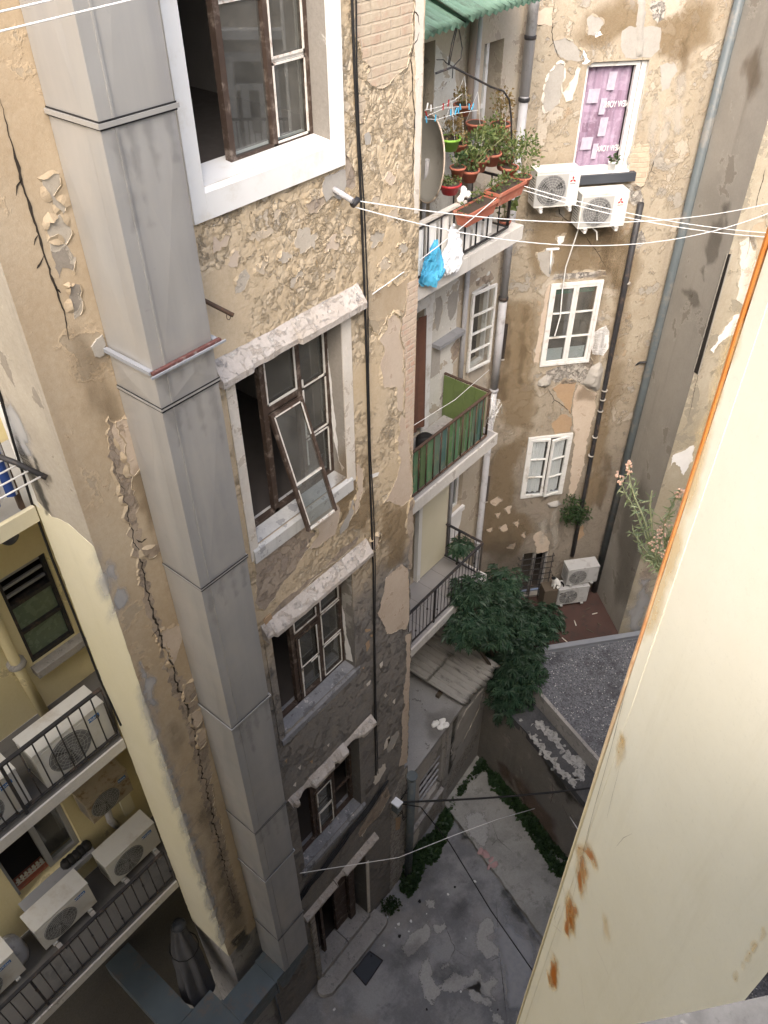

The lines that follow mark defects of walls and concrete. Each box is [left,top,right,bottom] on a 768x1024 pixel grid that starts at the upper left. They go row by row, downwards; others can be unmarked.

peeling [537,4,594,114]
peeling [586,13,605,37]
spalling [648,0,667,24]
peeling [659,62,678,92]
crack [0,100,69,339]
peeling [37,170,86,319]
peeling [213,192,354,294]
peeling [344,150,358,193]
peeling [668,445,695,475]
peeling [357,171,420,893]
peeling [486,496,551,554]
crack [114,454,236,905]